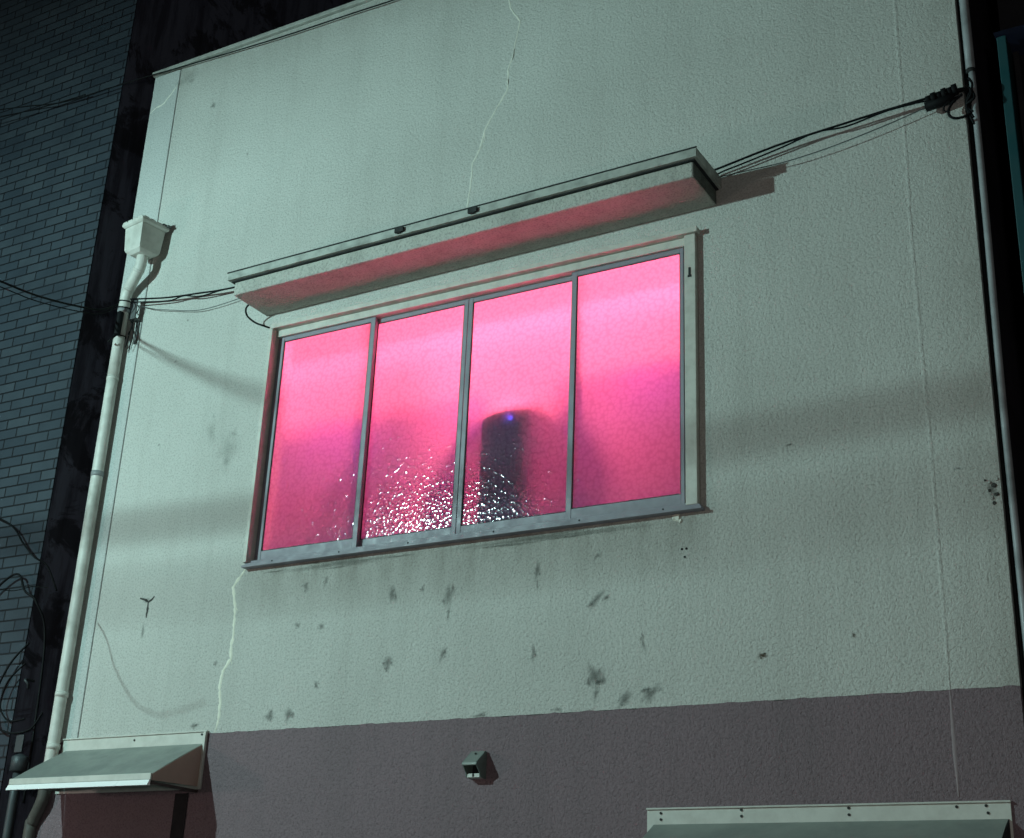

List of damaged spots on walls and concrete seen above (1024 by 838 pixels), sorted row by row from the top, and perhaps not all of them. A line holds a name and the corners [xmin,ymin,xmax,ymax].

crack [467,0,522,208]
crack [215,569,246,731]